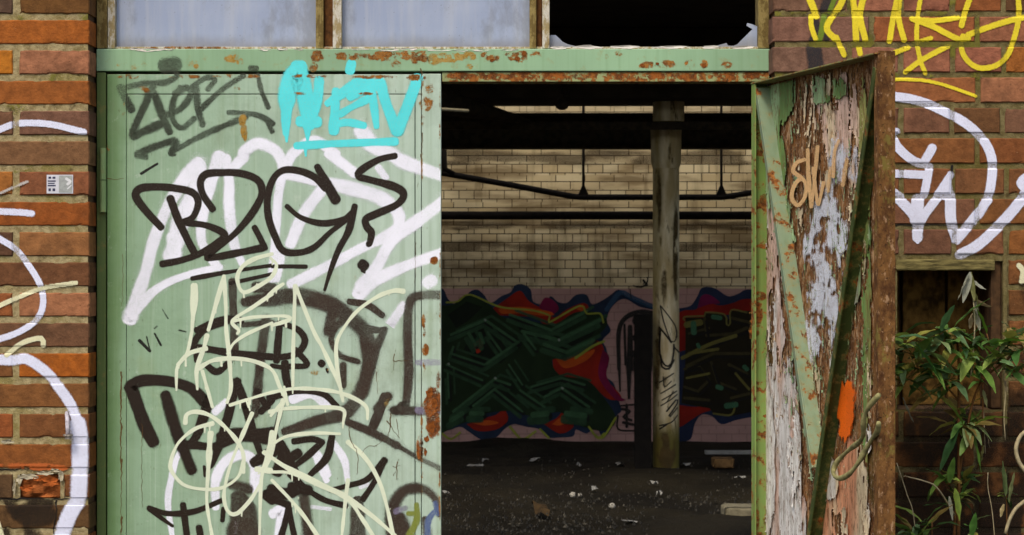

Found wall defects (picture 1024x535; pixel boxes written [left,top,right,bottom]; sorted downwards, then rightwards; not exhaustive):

rust [292,47,628,126]
rust [639,60,708,81]
rust [719,61,766,82]
peeling [766,70,867,423]
rust [749,291,766,340]
rust [416,315,441,492]
spalling [0,462,96,498]